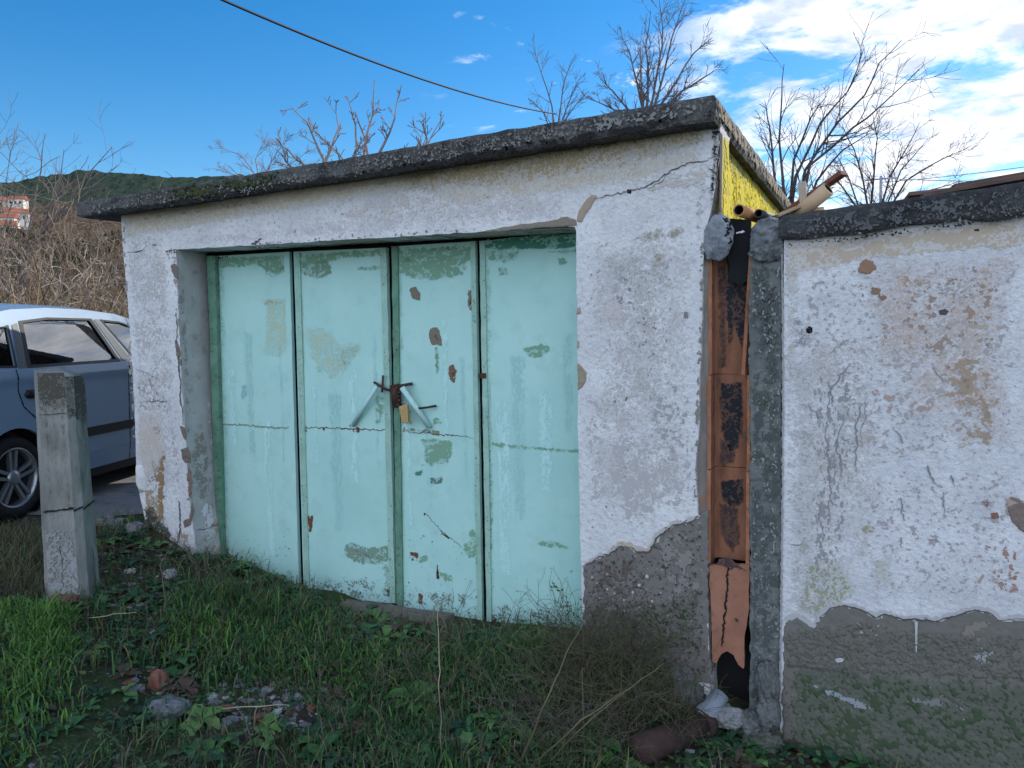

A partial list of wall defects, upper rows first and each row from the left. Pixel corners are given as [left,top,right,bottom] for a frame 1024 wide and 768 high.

spalling [394,195,597,236]
crack [596,156,720,199]
peeling [409,287,420,300]
peeling [429,327,442,346]
peeling [153,426,221,556]
crack [791,339,866,550]
spalling [754,258,1024,743]
spalling [583,510,713,684]